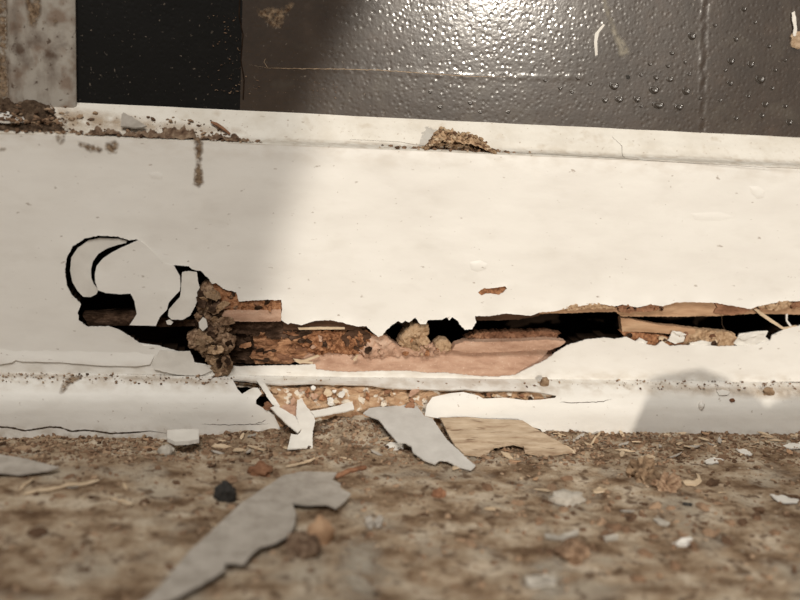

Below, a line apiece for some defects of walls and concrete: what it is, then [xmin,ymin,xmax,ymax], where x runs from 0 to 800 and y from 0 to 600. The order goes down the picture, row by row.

peeling [70,238,200,326]
spalling [478,286,506,295]
peeling [0,343,158,366]
peeling [306,335,337,351]
peeling [402,339,439,356]
peeling [256,379,280,407]
crack [0,426,161,434]
peeling [167,429,199,445]
peeling [287,398,354,450]